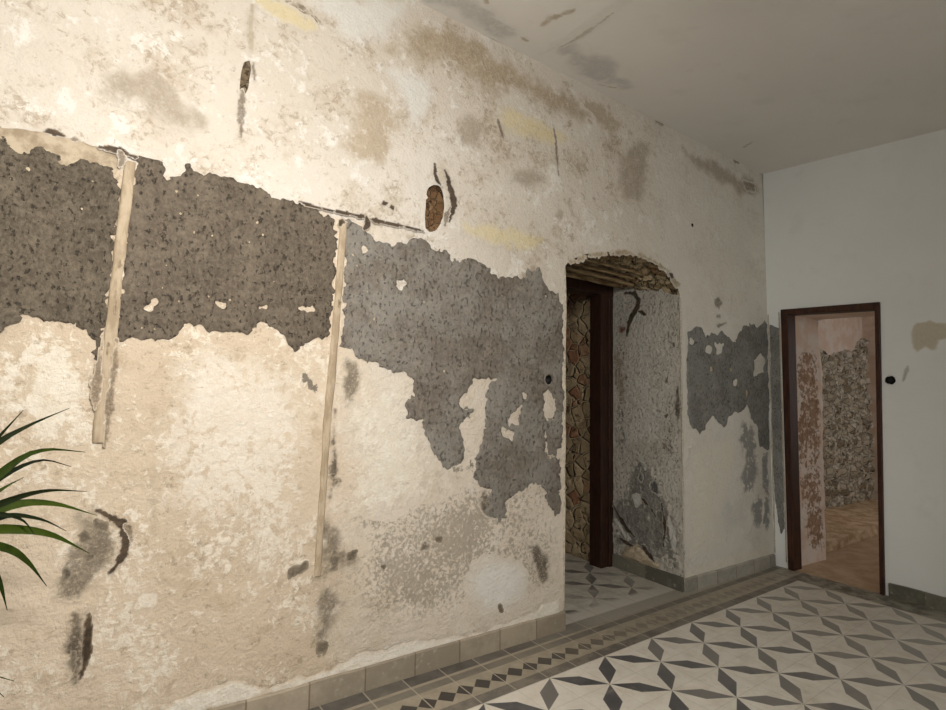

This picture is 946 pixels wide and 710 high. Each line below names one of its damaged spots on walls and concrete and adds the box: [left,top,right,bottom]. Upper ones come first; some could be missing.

damp [550,41,638,92]
flaking render [0,126,119,174]
spalling [910,319,946,353]
peeling [0,315,94,449]
flaking render [337,356,564,641]